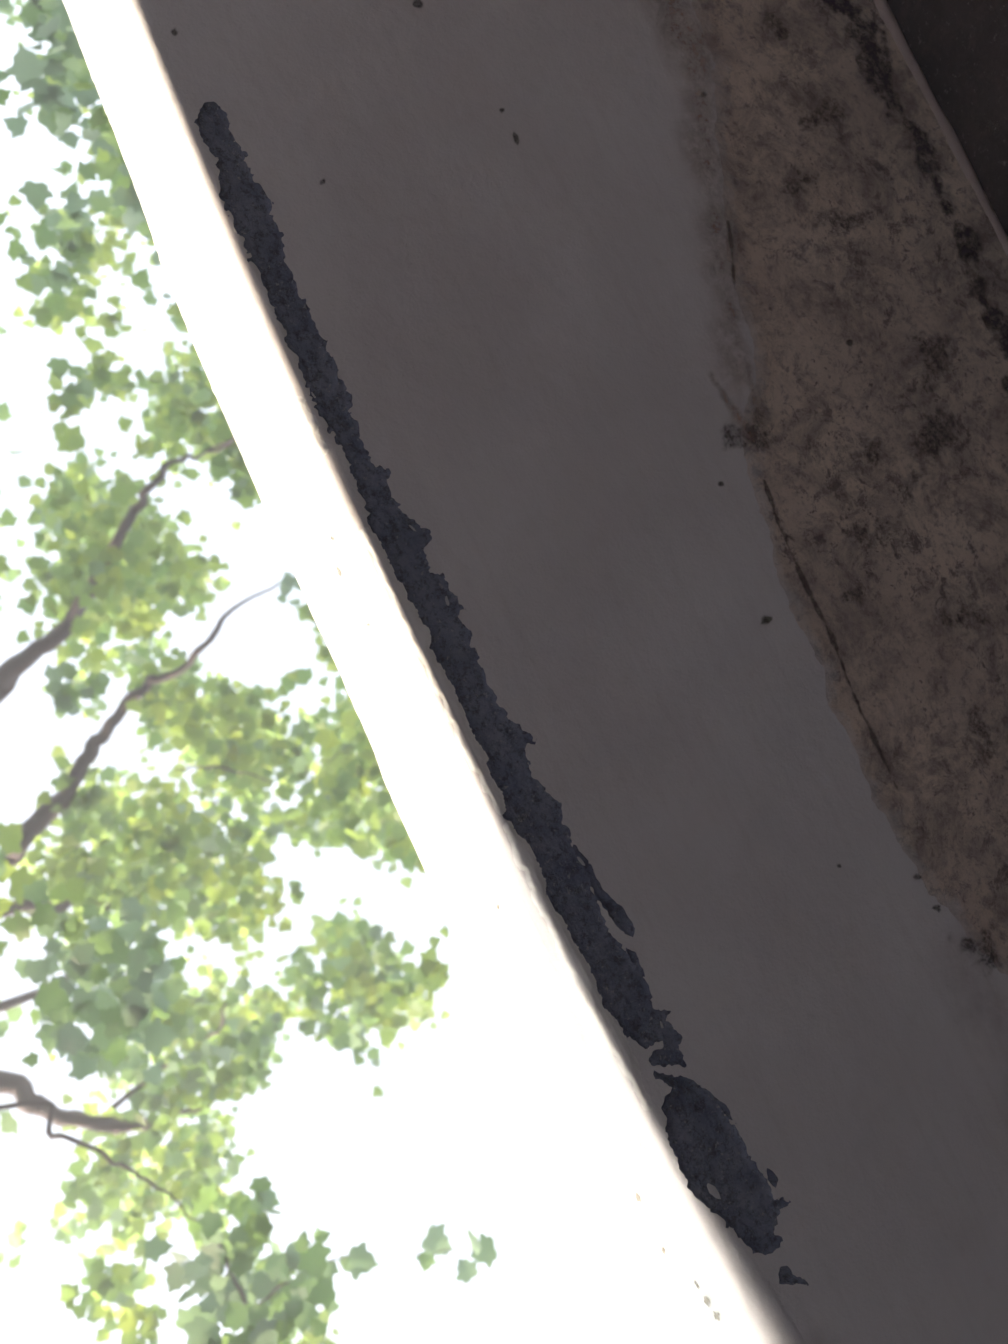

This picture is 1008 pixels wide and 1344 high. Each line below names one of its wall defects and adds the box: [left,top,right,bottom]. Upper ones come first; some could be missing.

spalling [194,101,791,1255]
spalling [778,1266,809,1286]